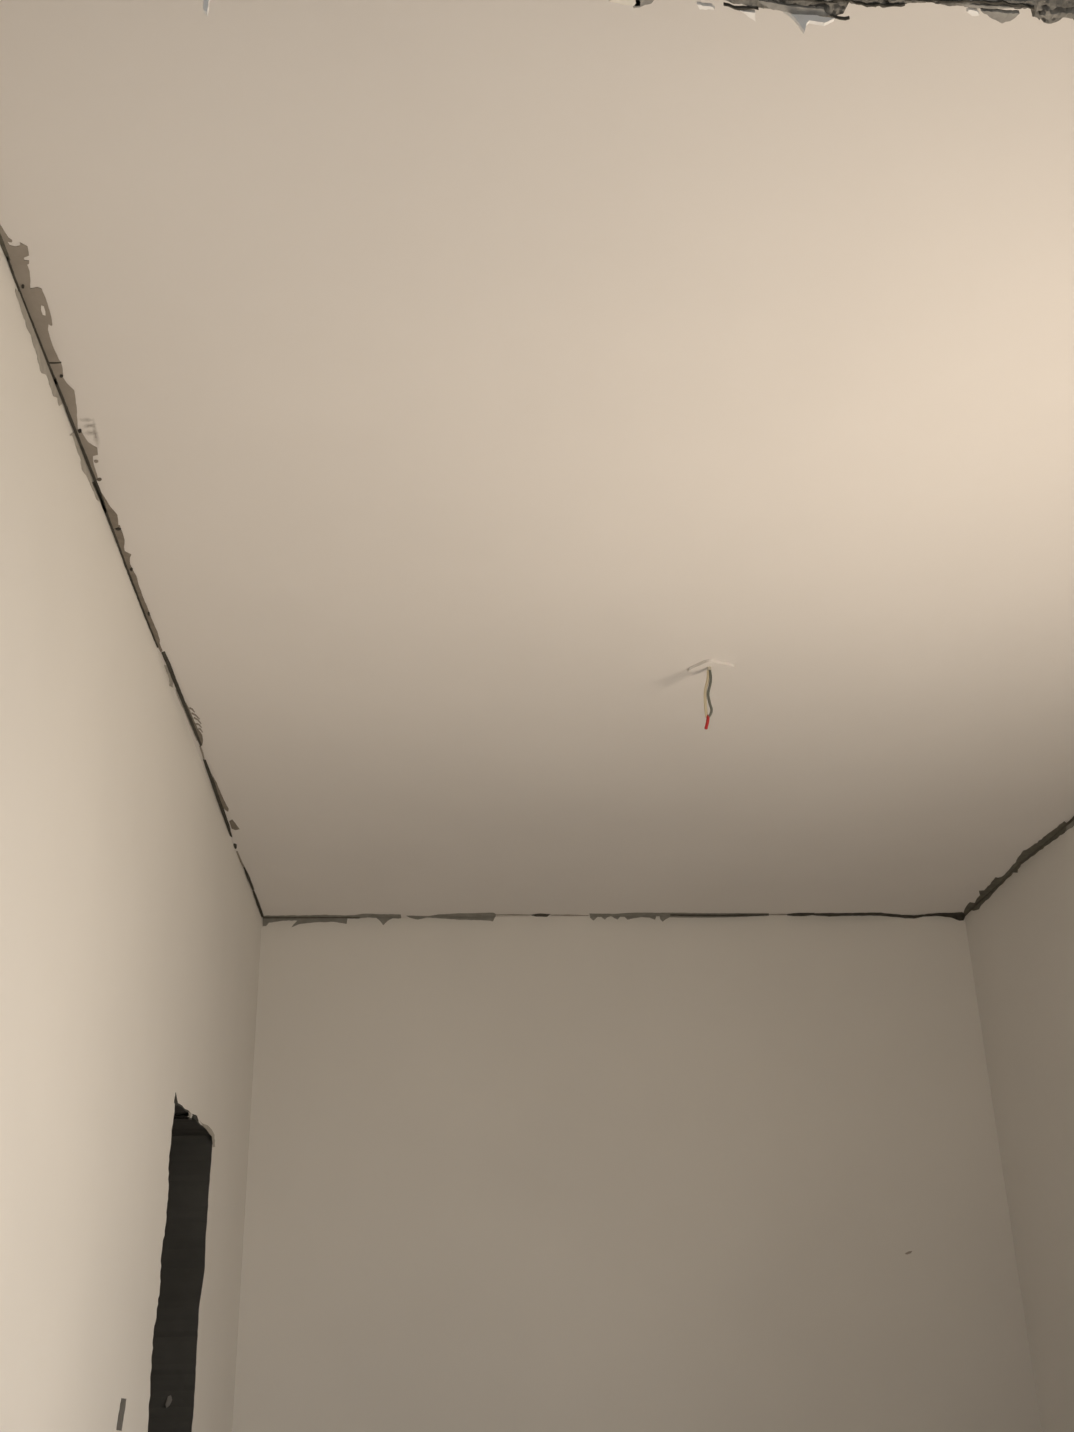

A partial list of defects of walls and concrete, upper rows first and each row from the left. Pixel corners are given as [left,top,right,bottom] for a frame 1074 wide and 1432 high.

peeling [0,225,203,746]
peeling [212,775,239,830]
crack [497,816,1074,922]